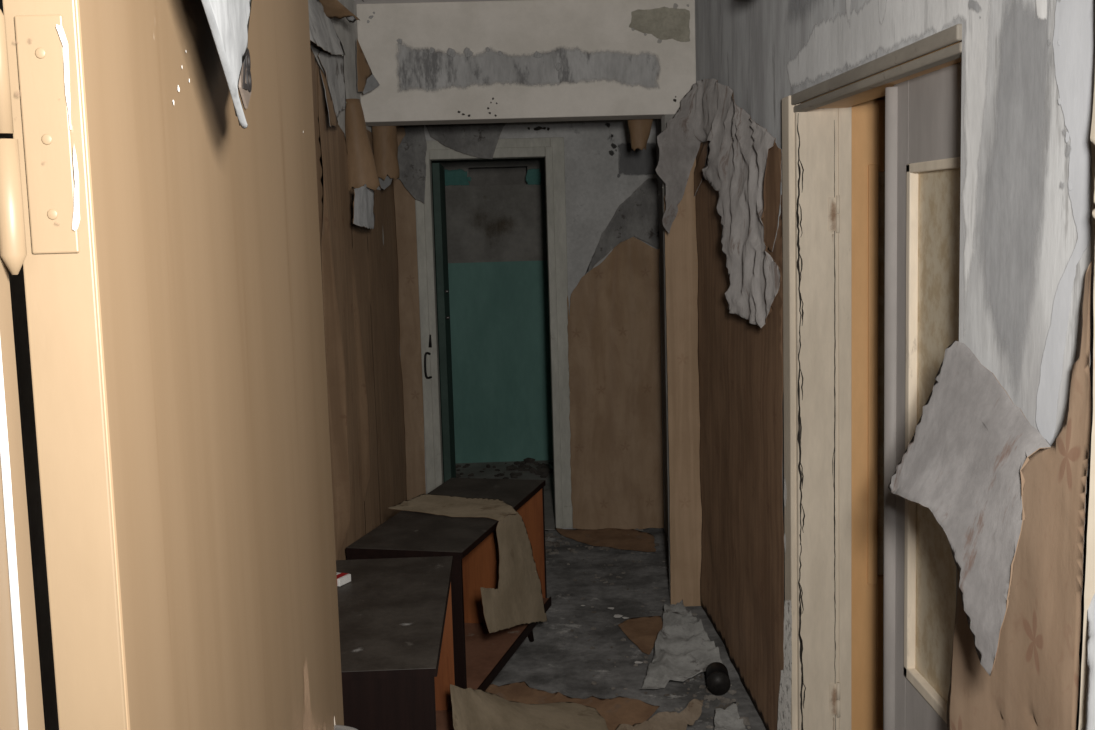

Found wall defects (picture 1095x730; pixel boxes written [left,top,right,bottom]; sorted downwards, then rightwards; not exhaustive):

peeling [397,3,690,91]
peeling [615,143,657,177]
peeling [982,0,1095,445]
peeling [777,600,792,730]